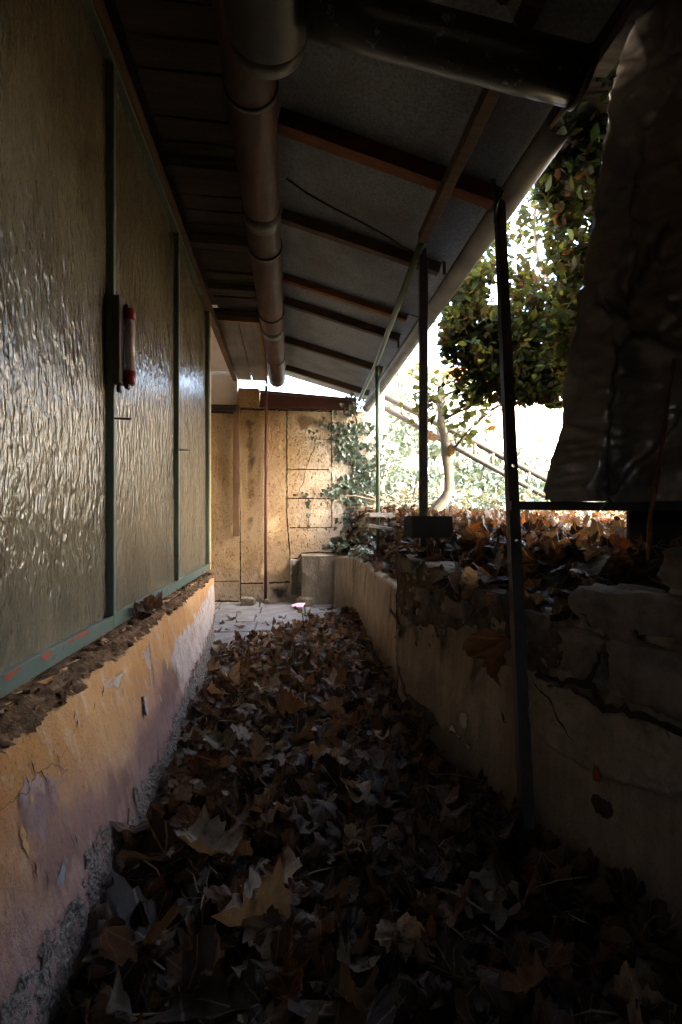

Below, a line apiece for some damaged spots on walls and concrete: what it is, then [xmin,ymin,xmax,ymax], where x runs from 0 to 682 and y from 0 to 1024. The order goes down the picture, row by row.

flaking render [395,552,511,651]
crack [534,650,682,740]
crack [1,747,68,810]
flaking render [0,571,216,1024]